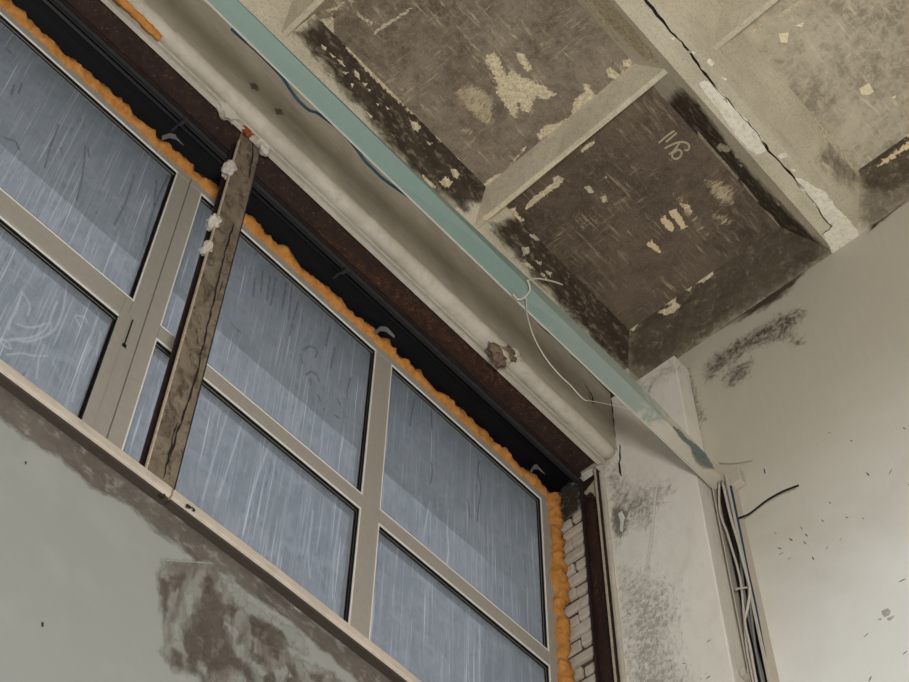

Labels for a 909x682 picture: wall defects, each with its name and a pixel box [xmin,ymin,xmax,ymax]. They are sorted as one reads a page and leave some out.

peeling [319,0,412,35]
peeling [321,44,421,132]
peeling [485,52,557,118]
peeling [537,58,633,140]
crack [644,0,832,234]
peeling [422,156,461,188]
peeling [876,134,909,166]
peeling [509,176,564,222]
peeling [661,203,692,232]
peeling [520,234,552,279]
peeling [657,298,680,315]
peeling [159,559,341,682]